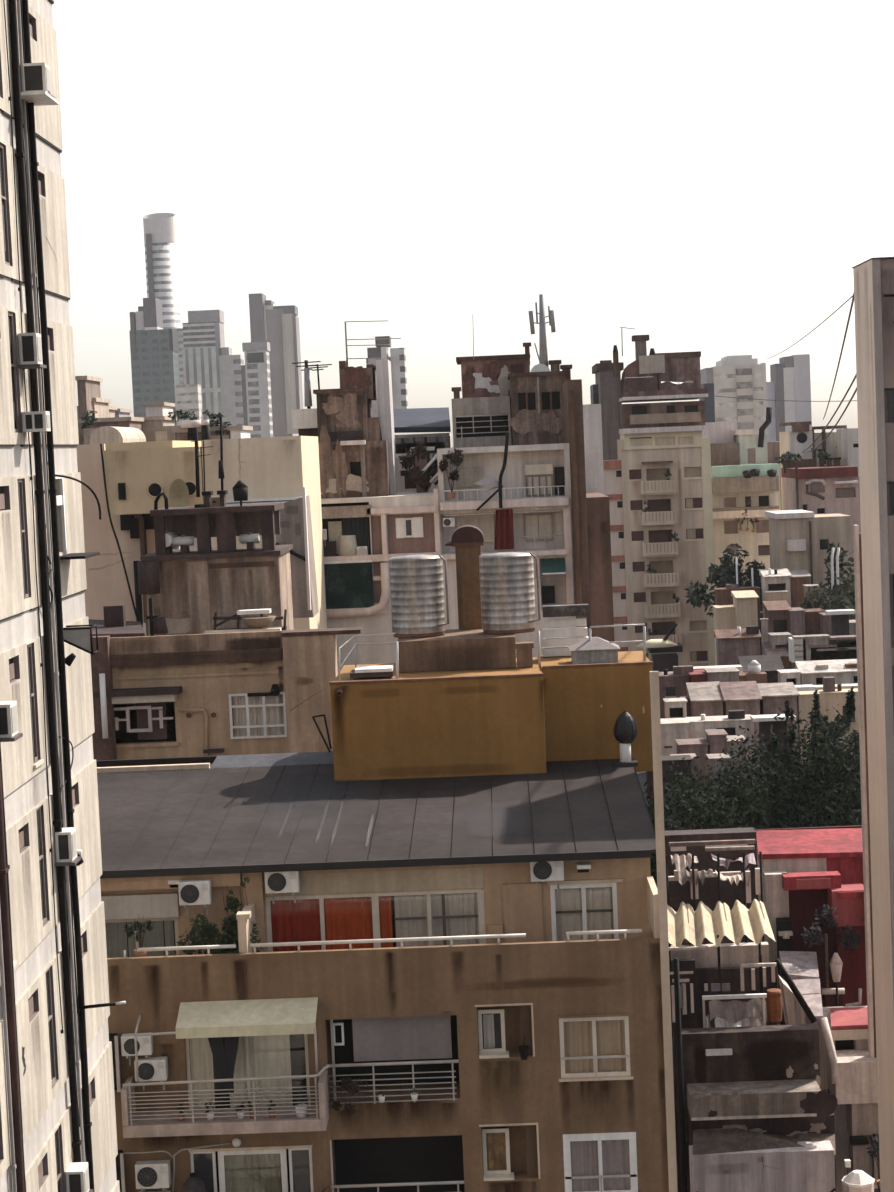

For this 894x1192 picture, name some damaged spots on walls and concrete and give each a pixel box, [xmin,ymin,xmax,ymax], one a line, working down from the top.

peeling [462,361,510,397]
spalling [509,409,564,436]